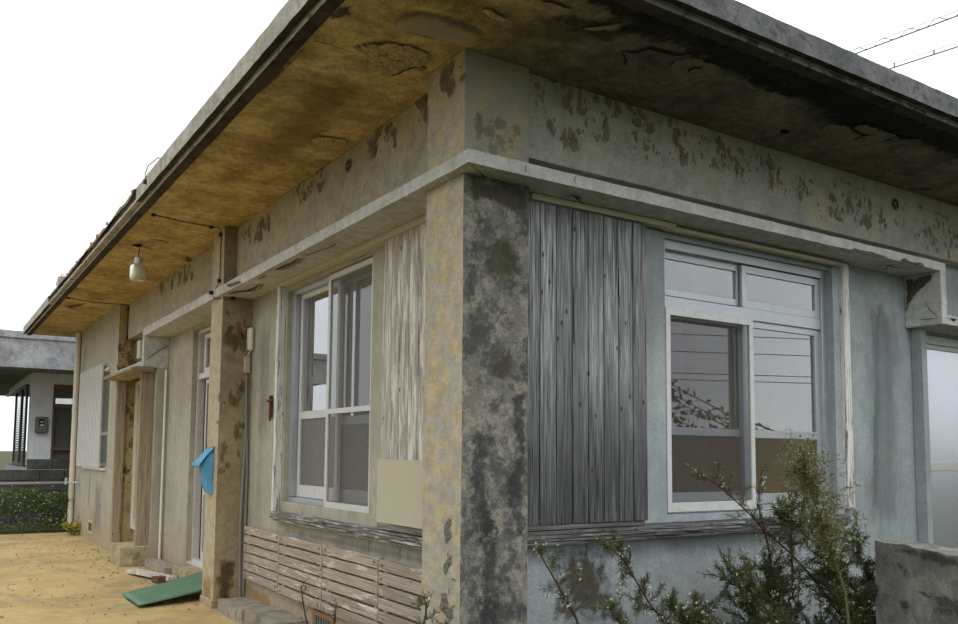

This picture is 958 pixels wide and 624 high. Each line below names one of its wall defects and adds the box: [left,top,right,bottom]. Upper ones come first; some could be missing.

peeling [367,122,397,159]
peeling [439,61,466,98]
peeling [475,112,520,155]
peeling [534,78,958,260]
damp [550,0,958,159]
damp [487,241,517,281]
damp [469,432,499,624]
damp [508,393,526,534]